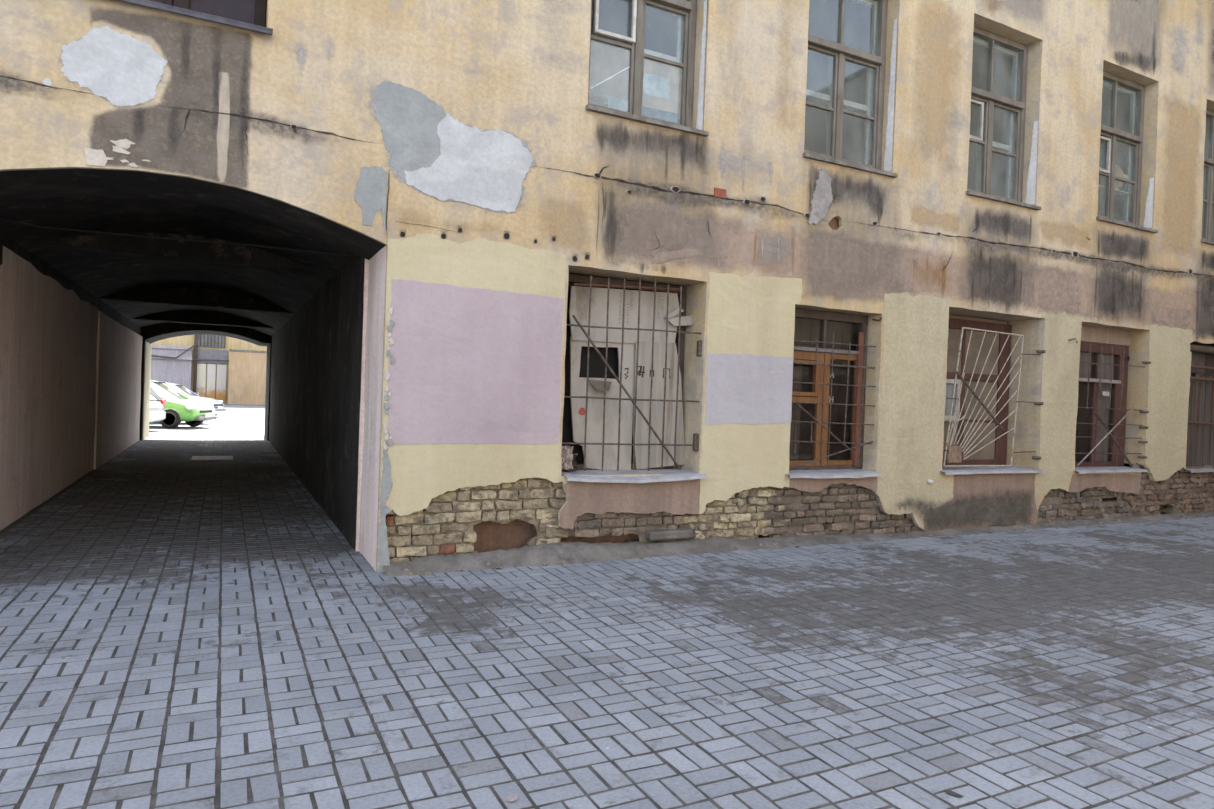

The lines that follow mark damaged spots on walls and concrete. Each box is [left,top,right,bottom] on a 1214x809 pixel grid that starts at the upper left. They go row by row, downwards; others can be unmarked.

leakage [1118,41,1155,70]
leakage [91,9,251,188]
leakage [601,124,705,170]
leakage [810,170,883,216]
leakage [976,213,1031,236]
leakage [1098,233,1146,259]
leakage [971,252,1022,309]
leakage [1095,270,1141,314]
leakage [1197,253,1214,336]
flaking render [381,307,922,563]
flaking render [1037,462,1214,523]